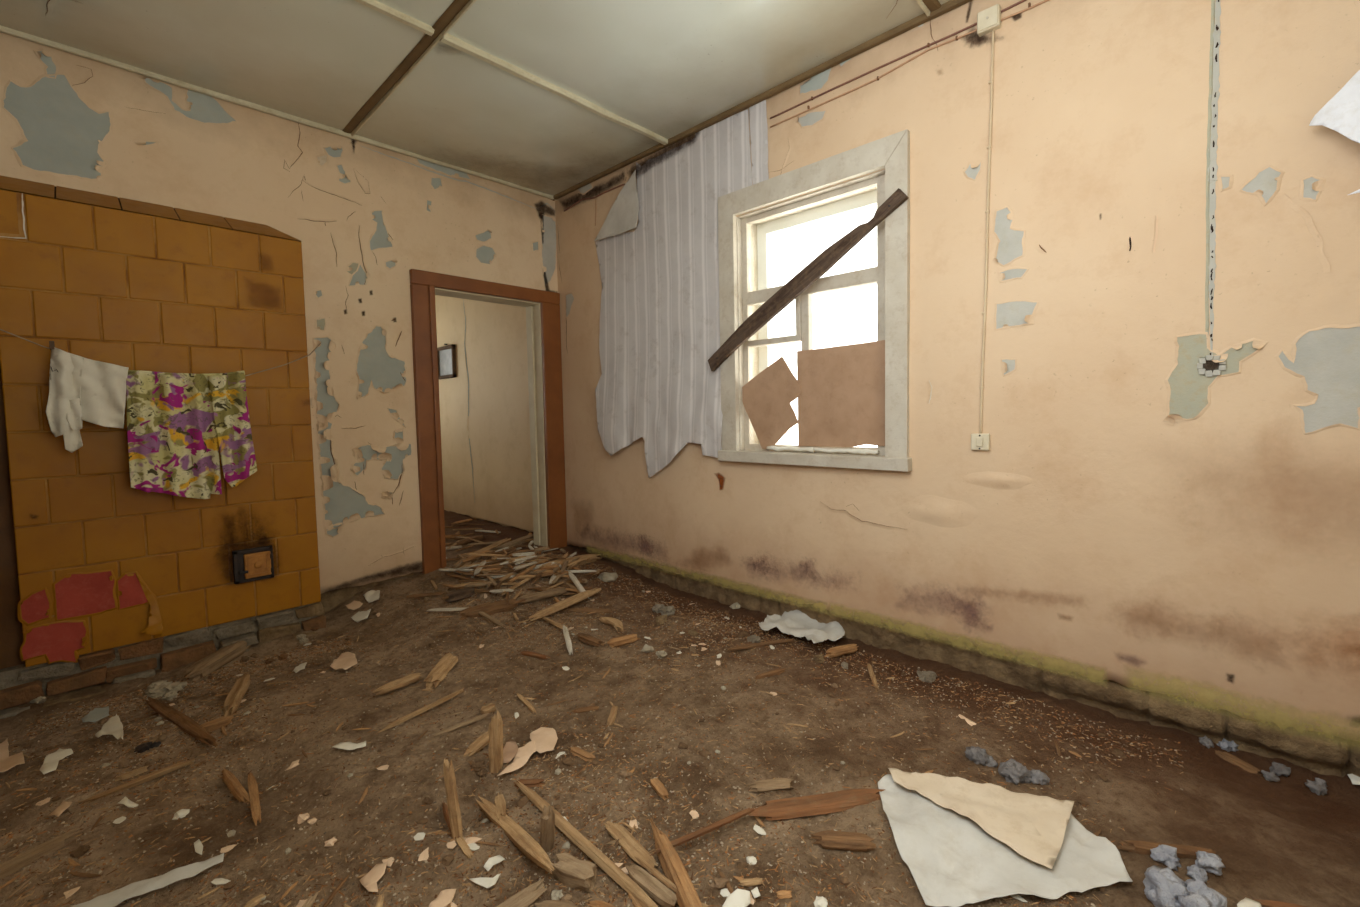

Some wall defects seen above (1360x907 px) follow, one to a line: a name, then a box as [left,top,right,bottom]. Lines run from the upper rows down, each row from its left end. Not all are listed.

peeling [1,49,113,182]
peeling [137,74,238,125]
peeling [368,209,397,270]
peeling [992,206,1029,283]
peeling [994,299,1039,331]
peeling [312,261,413,537]
peeling [1162,323,1360,435]
peeling [17,569,163,664]